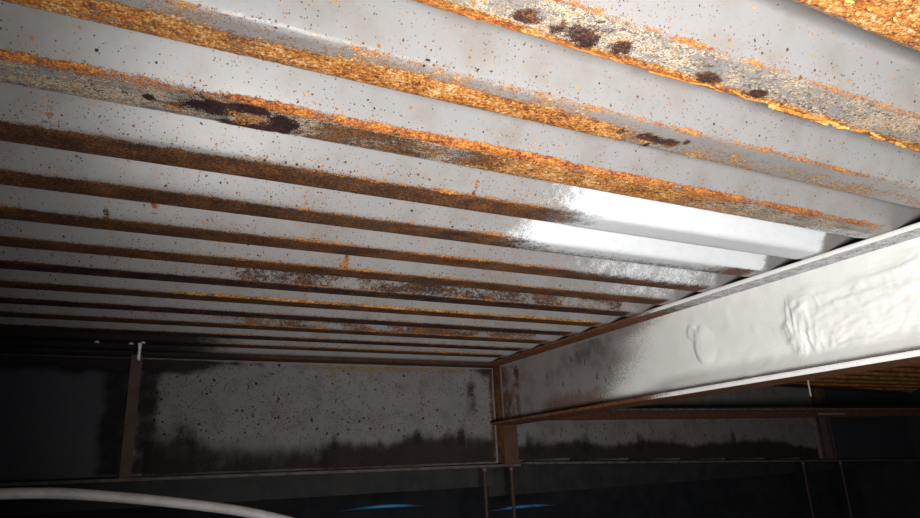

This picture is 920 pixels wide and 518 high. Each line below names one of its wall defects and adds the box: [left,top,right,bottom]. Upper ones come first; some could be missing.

corrosion [0,0,920,358]
leakage [142,425,496,475]
corrosion [131,364,532,474]